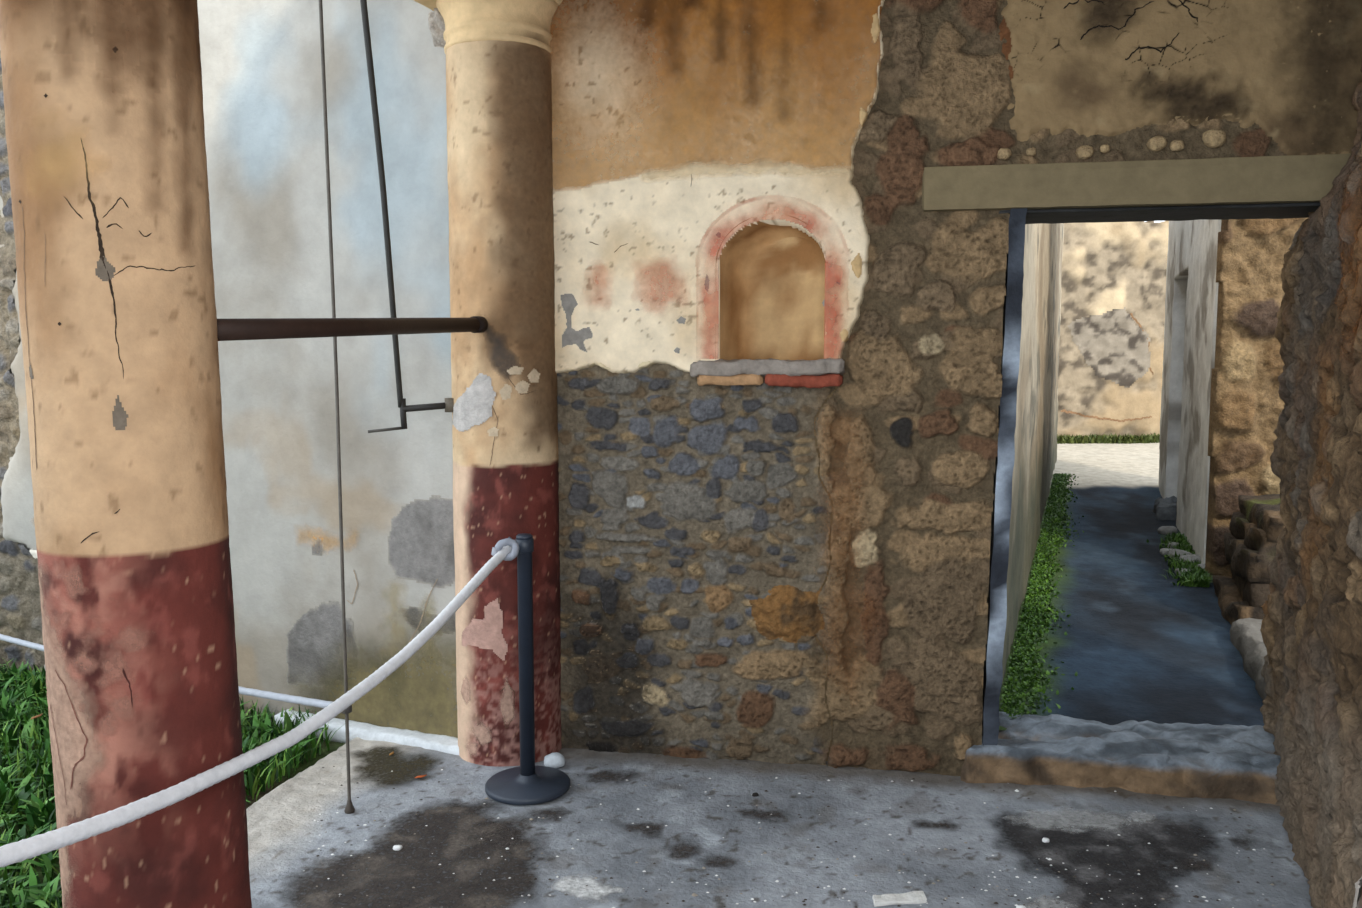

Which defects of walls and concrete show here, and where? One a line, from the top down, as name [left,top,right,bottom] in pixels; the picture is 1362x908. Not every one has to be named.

crack [1013,0,1225,73]
crack [64,139,196,379]
water stain [487,0,883,437]
spalling [0,52,140,829]
spalling [387,495,455,588]
spalling [557,0,1287,776]
spalling [1260,81,1362,908]
peeling [398,598,508,660]
water stain [287,800,571,908]
water stain [669,843,735,867]
water stain [915,821,956,829]
water stain [994,813,1247,908]